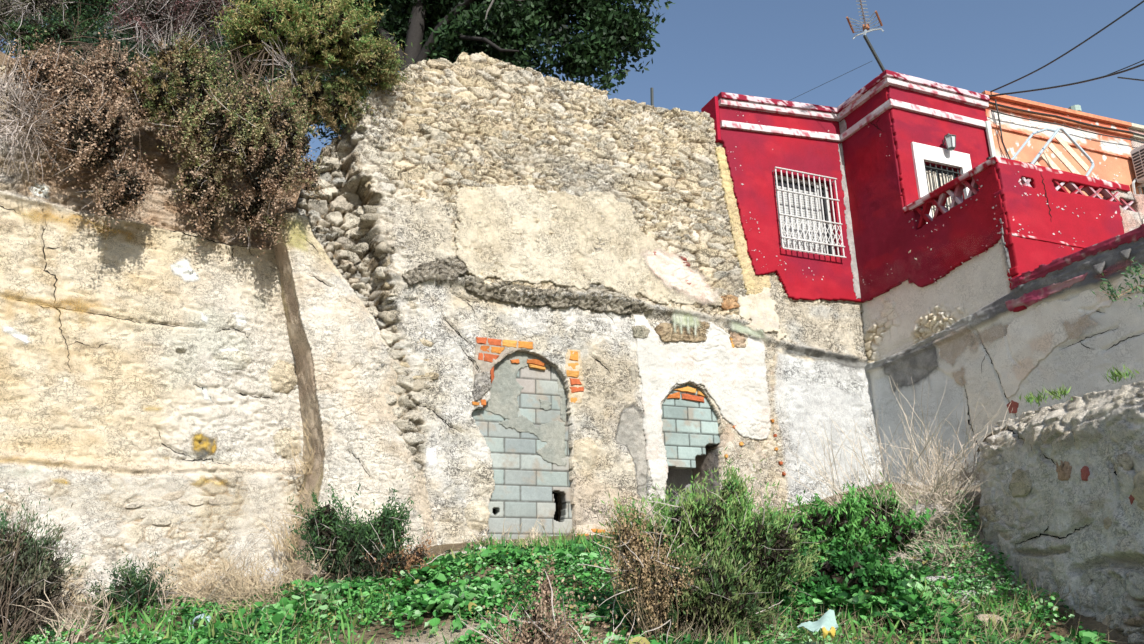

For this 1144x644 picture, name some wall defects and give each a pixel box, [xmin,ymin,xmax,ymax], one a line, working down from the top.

crack [0,195,254,370]
flaking render [402,146,787,503]
flaking render [789,382,867,479]
crack [964,330,1055,464]